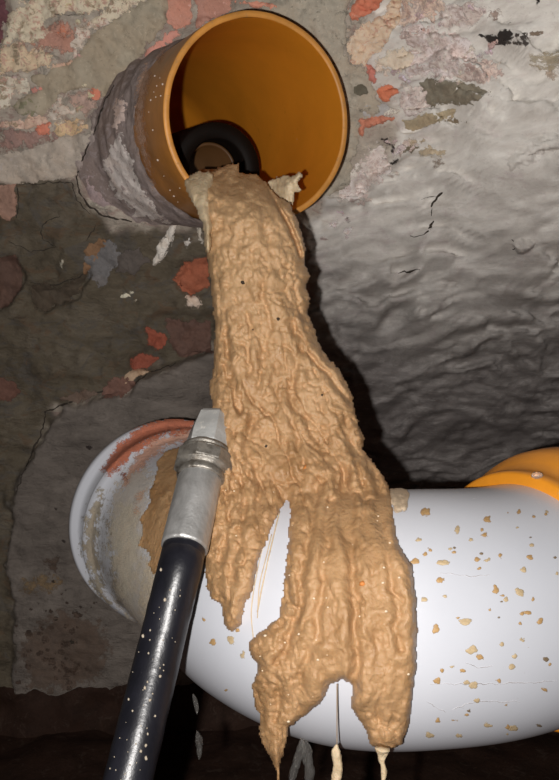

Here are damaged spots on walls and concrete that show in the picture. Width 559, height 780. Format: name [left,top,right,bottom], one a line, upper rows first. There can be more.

peeling [0,0,145,110]
peeling [0,84,101,137]
peeling [329,0,504,239]
crack [410,192,443,237]
spalling [31,238,151,312]
flaking render [172,257,210,296]
flaking render [130,317,214,370]
crack [16,401,72,494]